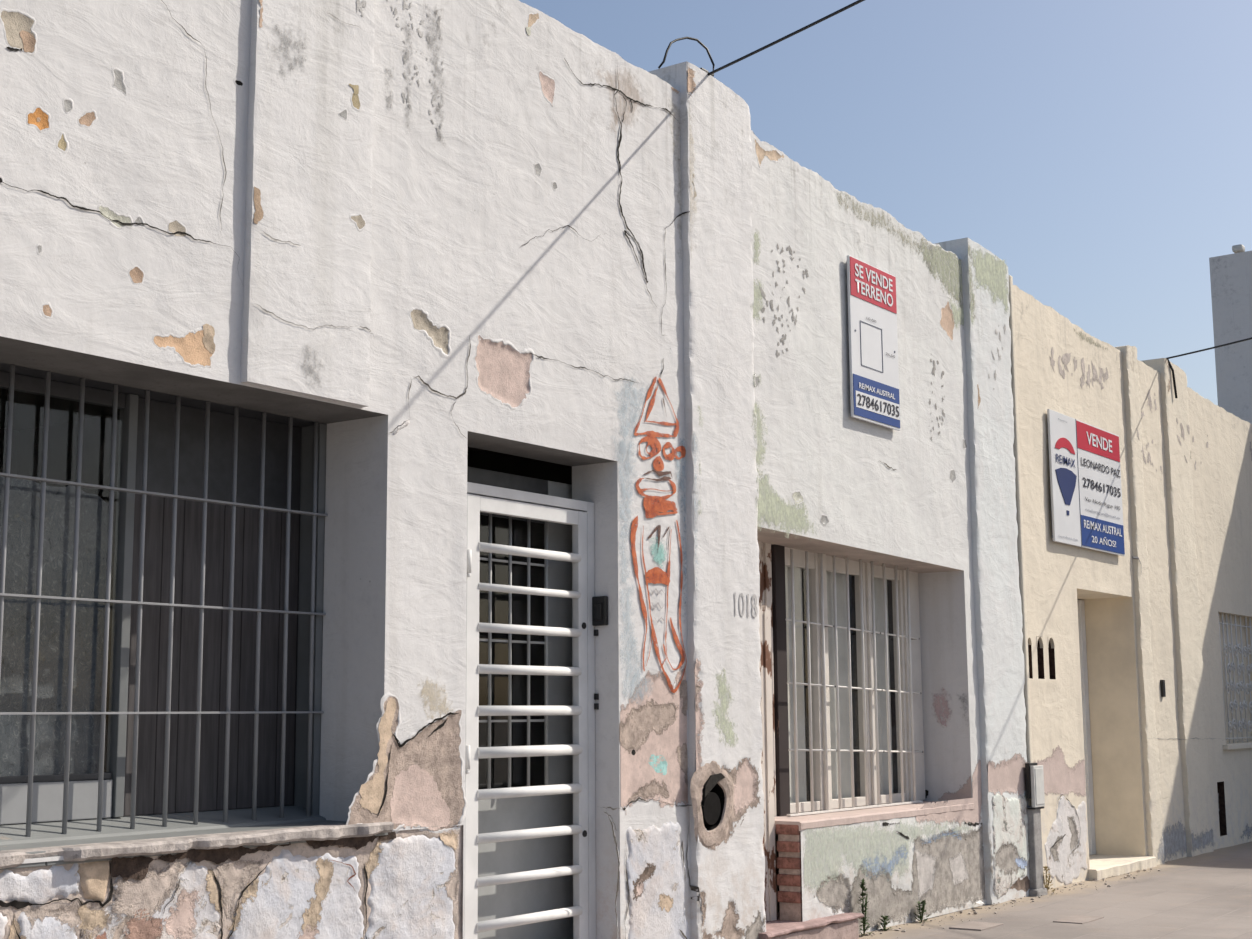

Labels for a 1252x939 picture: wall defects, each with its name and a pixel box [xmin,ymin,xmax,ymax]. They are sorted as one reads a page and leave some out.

peeling [0,8,38,56]
crack [1,0,375,339]
crack [531,58,690,384]
peeling [152,323,216,368]
flaking render [408,307,452,359]
crack [390,336,471,438]
flaking render [473,334,535,410]
flaking render [620,658,761,850]
flaking render [296,692,468,939]
flaking render [814,745,1086,933]
flaking render [8,842,291,939]